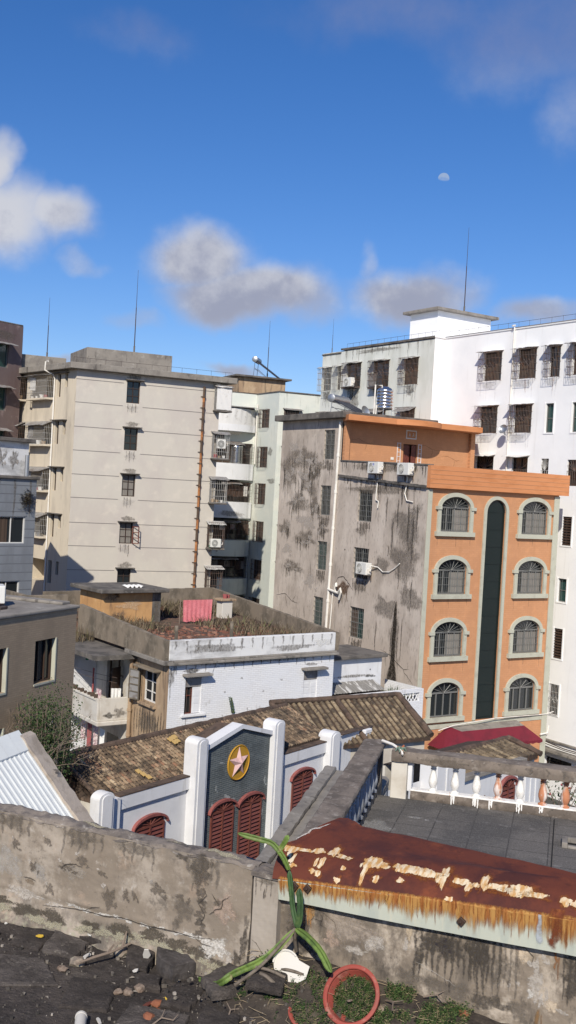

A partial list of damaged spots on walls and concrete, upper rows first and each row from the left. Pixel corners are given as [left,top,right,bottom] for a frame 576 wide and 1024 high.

damp [269,449,420,681]
damp [169,635,322,688]
damp [173,854,219,926]
damp [189,876,272,965]
damp [287,907,317,957]
rust [272,770,576,977]
peeling [284,824,576,908]
damp [401,926,527,1024]
damp [562,954,576,1003]